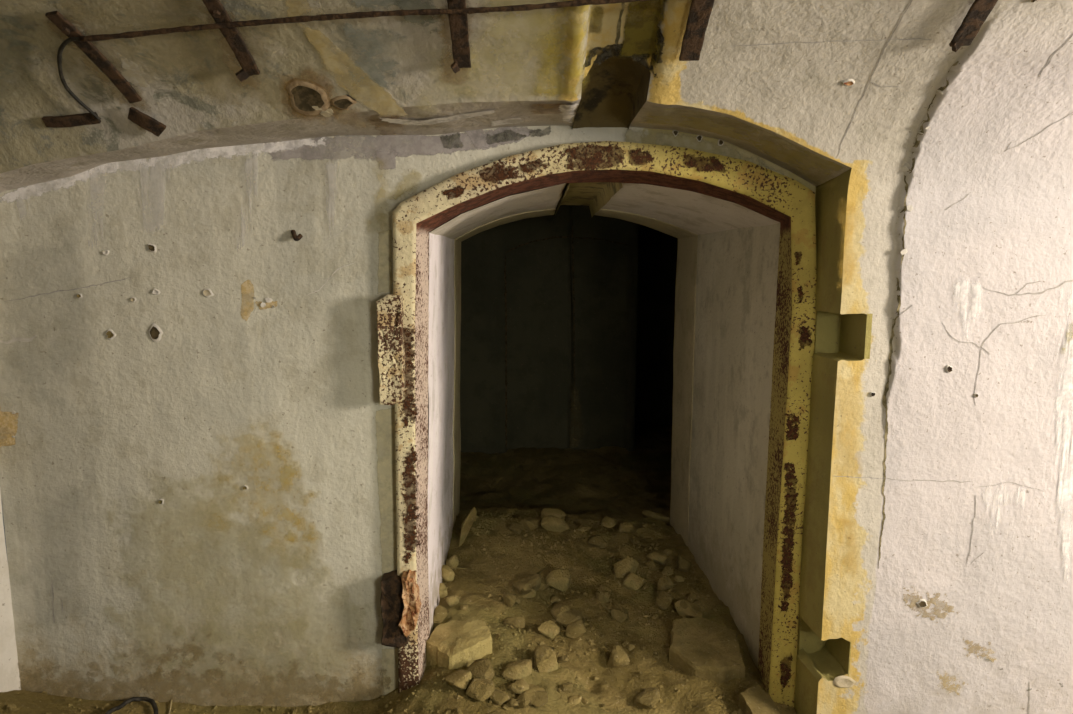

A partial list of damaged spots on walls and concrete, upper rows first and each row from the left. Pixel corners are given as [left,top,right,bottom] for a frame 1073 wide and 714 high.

corrosion [477,158,549,184]
corrosion [565,144,655,171]
corrosion [683,154,727,173]
corrosion [442,185,465,200]
corrosion [798,326,812,350]
corrosion [401,326,418,428]
corrosion [785,413,799,441]
corrosion [401,445,421,566]
corrosion [779,462,799,612]
corrosion [780,653,793,692]